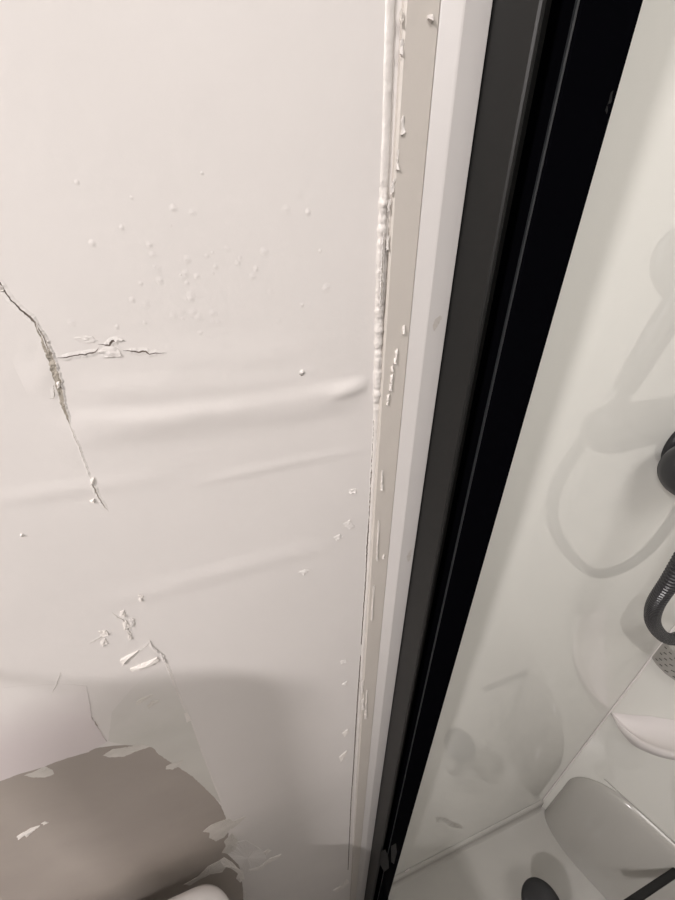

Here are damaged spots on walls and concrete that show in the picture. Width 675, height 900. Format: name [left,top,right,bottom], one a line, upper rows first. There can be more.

crack [0,278,167,511]
peeling [0,641,246,900]